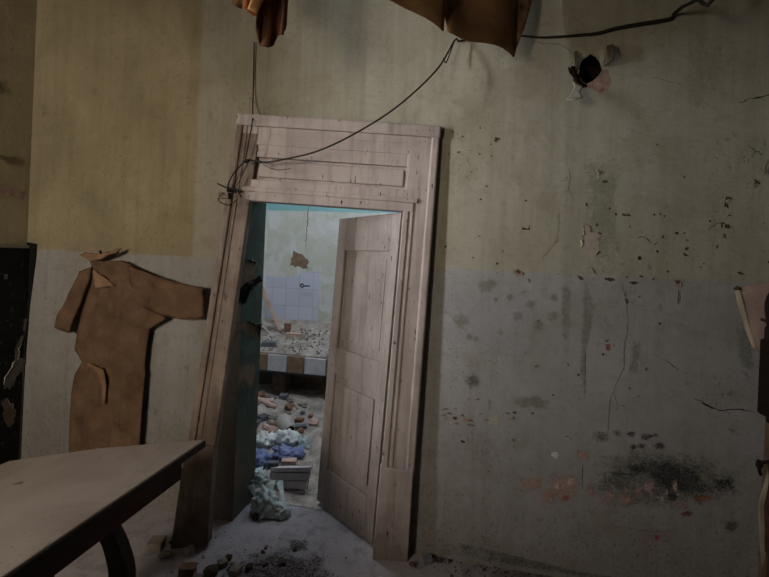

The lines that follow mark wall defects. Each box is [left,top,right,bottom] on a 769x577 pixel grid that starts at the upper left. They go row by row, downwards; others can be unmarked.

spalling [566,44,615,101]
flaking render [239,258,263,305]
flaking render [234,320,263,340]
crack [694,398,755,413]
water stain [604,432,733,503]